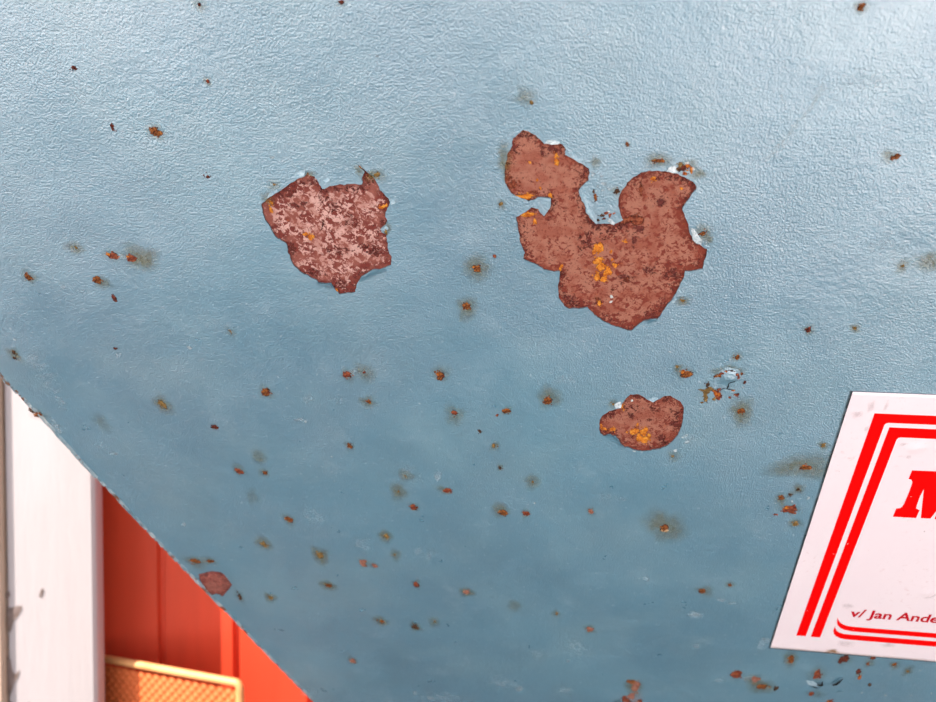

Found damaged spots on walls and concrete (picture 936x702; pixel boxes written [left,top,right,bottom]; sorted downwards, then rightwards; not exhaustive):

corrosion [505,130,707,330]
spalling [0,372,316,702]
corrosion [773,488,800,526]
corrosion [621,680,642,702]